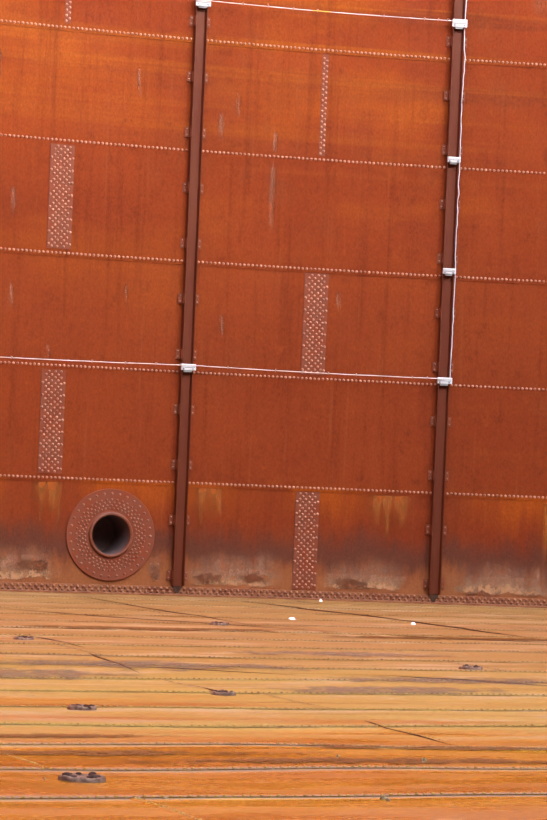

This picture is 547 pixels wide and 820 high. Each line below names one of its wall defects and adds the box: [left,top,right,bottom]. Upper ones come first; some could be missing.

water stain [0,553,48,580]
water stain [194,558,272,587]
water stain [328,567,398,591]
water stain [459,569,545,597]